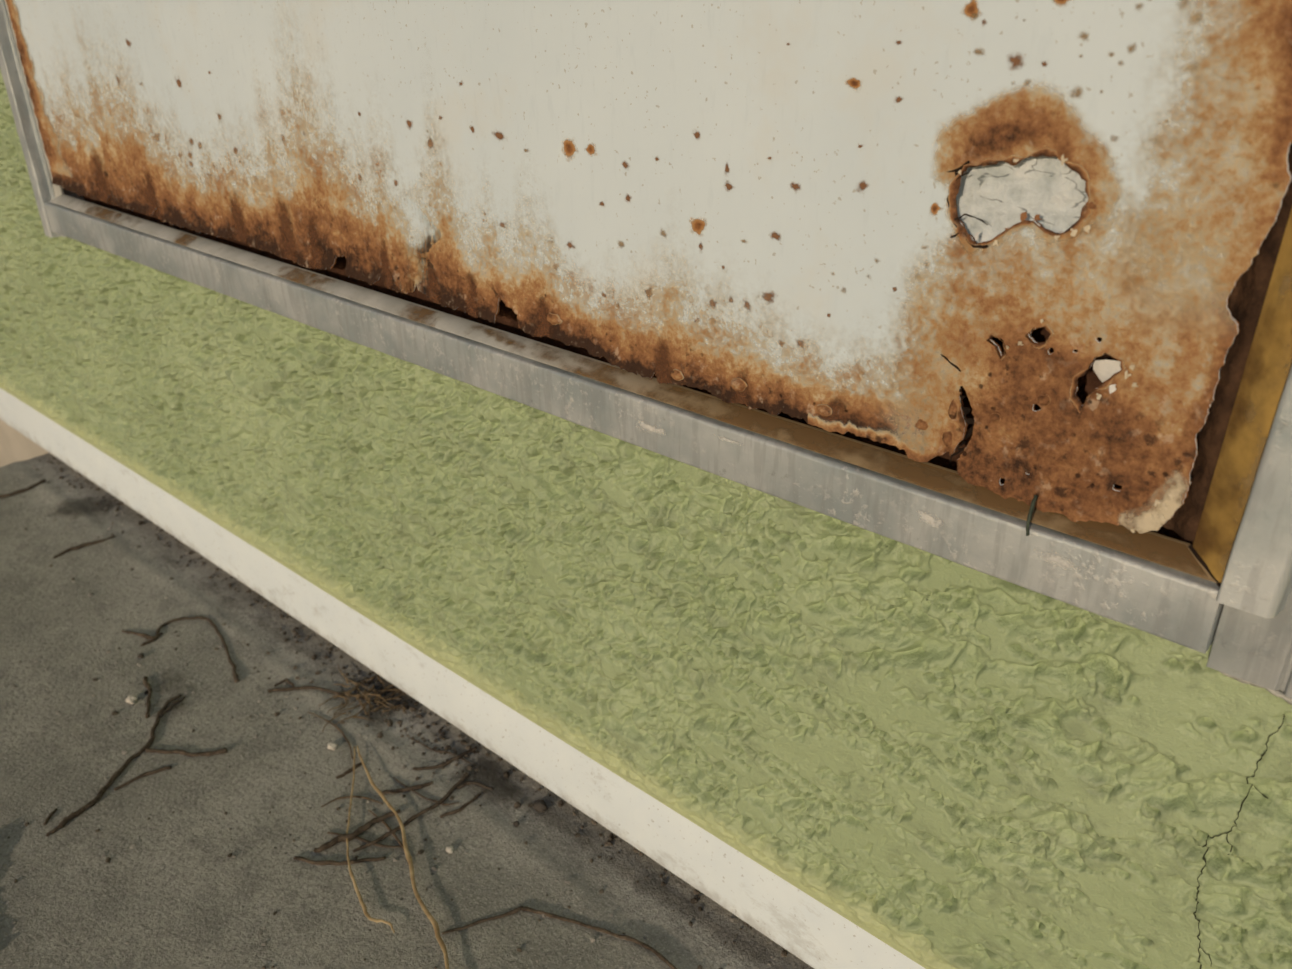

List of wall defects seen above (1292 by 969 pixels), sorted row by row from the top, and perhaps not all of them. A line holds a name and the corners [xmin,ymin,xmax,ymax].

corrosion [5,0,1292,583]
peeling [974,212,1041,246]
peeling [1096,365,1139,400]
crack [1193,715,1285,969]